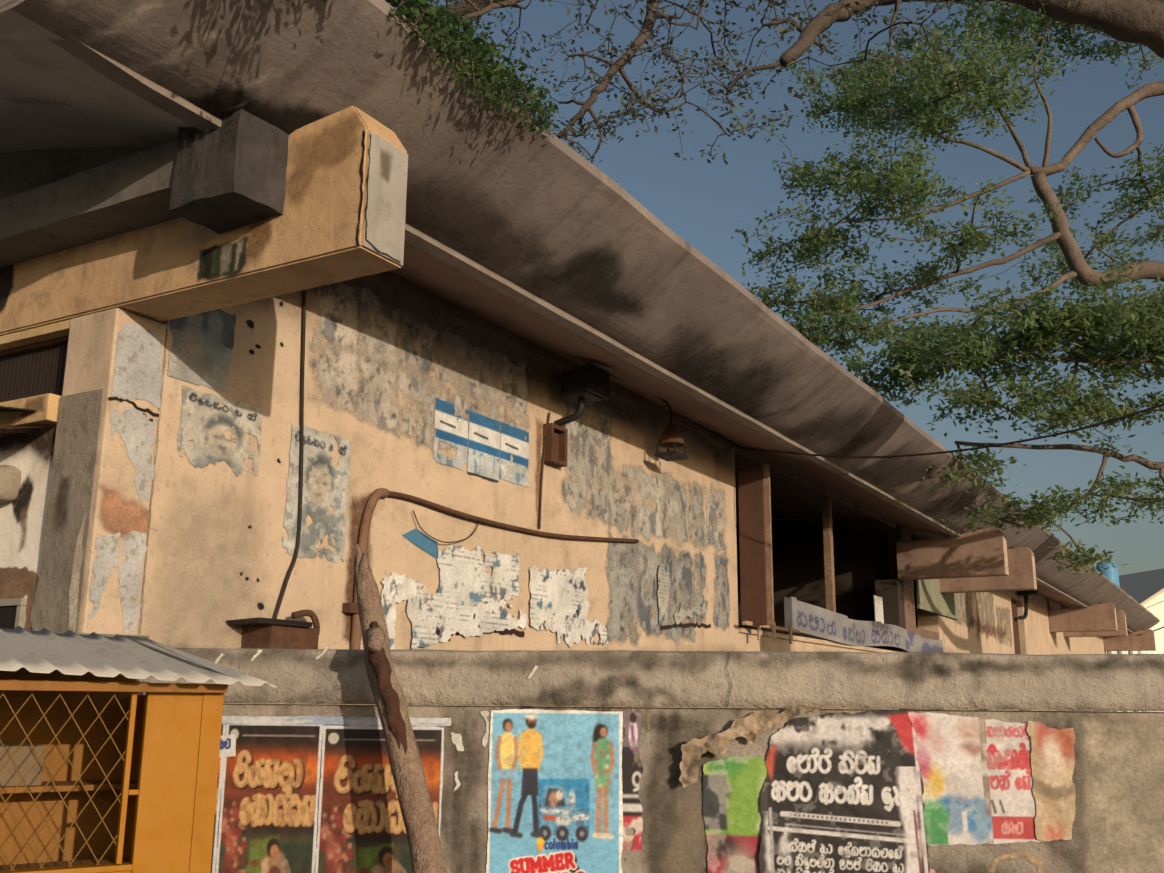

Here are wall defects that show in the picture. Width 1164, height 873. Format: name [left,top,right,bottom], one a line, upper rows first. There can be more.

damp [0,264,14,312]
damp [188,70,355,199]
crack [356,130,401,263]
damp [406,182,642,312]
crack [108,397,159,422]
peeling [110,322,163,502]
damp [670,338,779,418]
peeling [86,531,147,633]